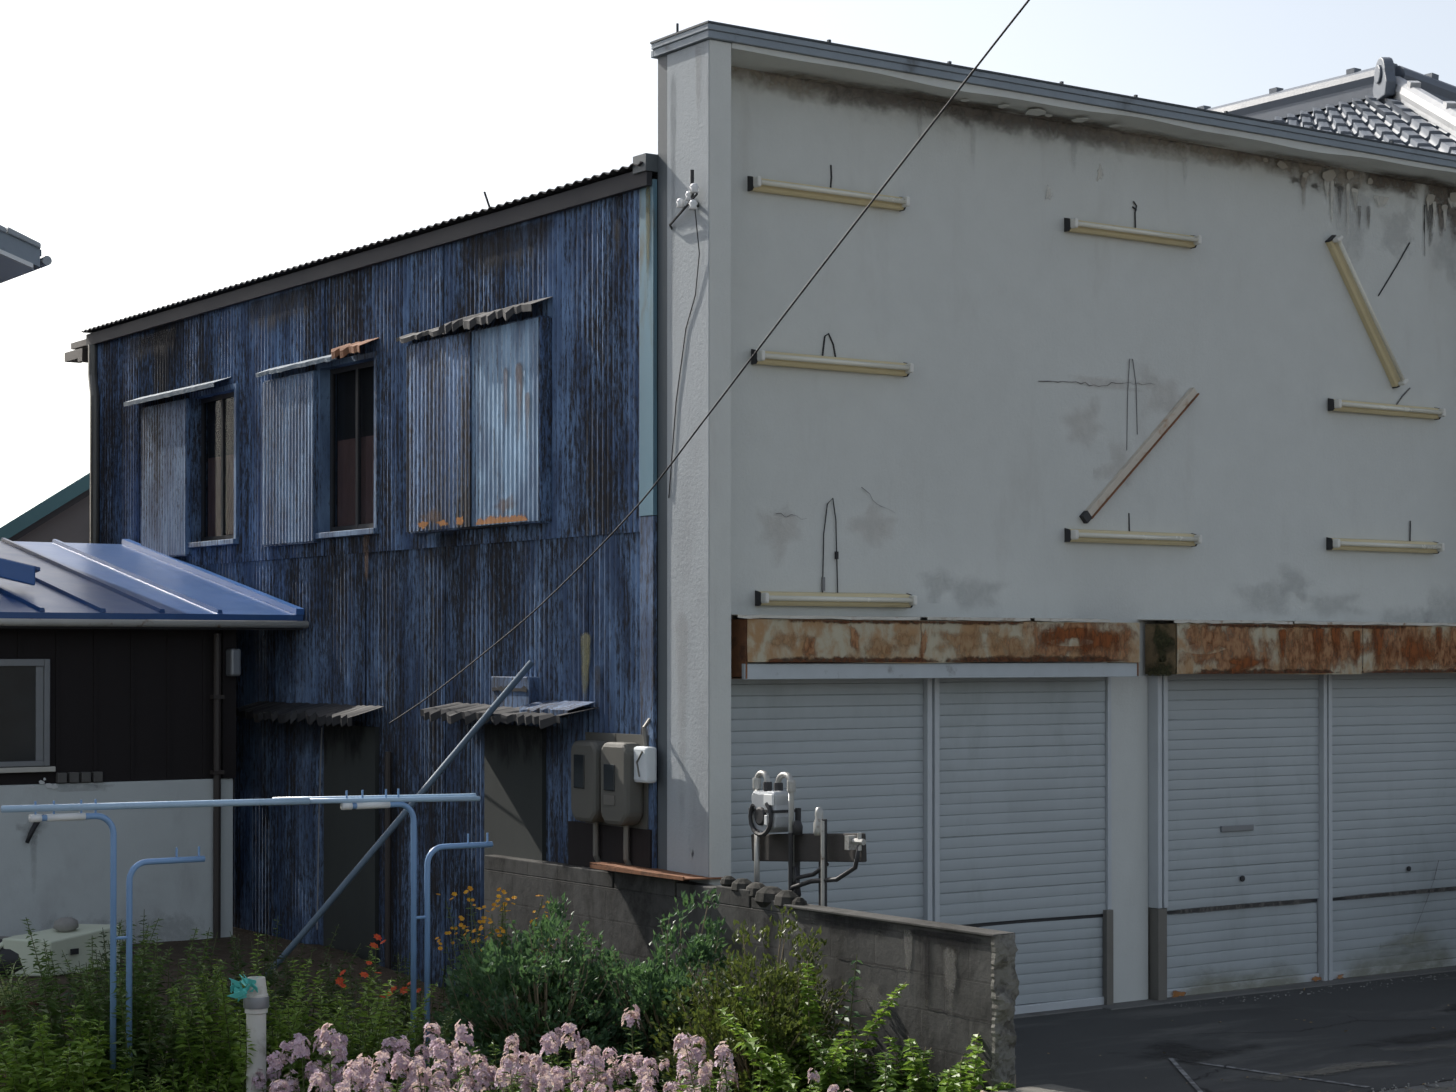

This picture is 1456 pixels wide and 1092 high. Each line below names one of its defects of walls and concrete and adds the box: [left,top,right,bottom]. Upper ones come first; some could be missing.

damp [731,66,1456,236]
corrosion [479,363,529,456]
corrosion [418,497,527,567]
corrosion [769,620,1137,662]
corrosion [1184,624,1456,674]